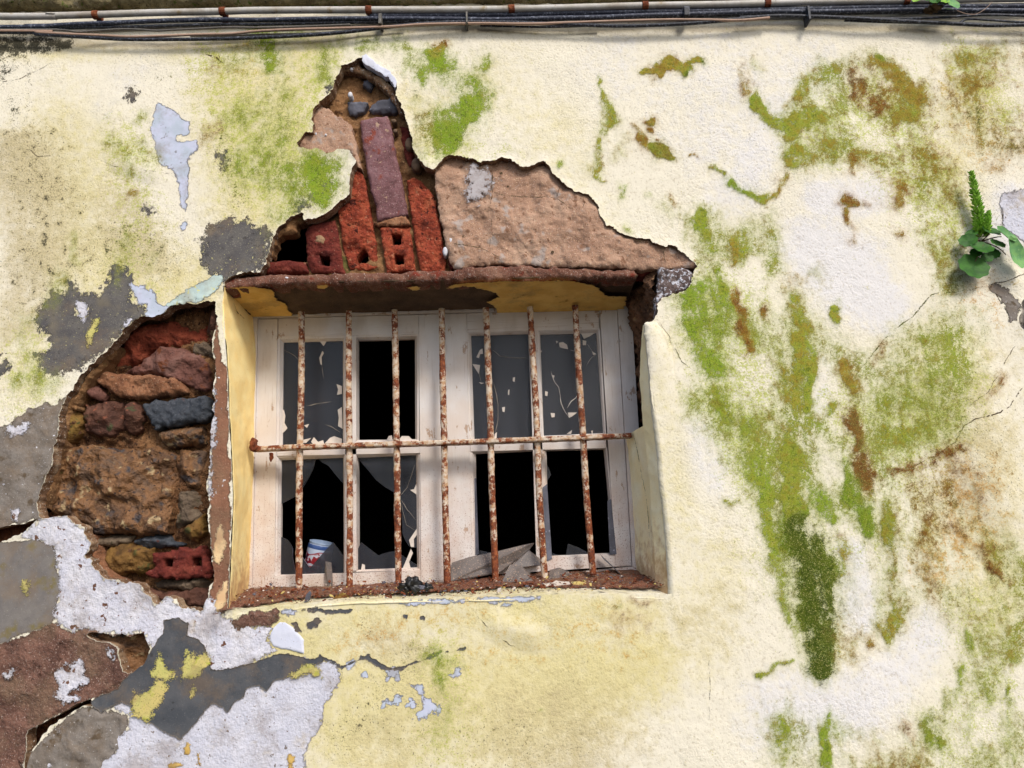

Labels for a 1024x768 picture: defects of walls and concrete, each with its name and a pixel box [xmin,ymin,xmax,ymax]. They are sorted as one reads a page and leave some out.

water stain [709,164,770,205]
peeling [999,188,1024,241]
water stain [773,272,819,414]
crack [853,274,1024,379]
peeling [989,283,1021,323]
spalling [0,54,696,768]
crack [897,349,1022,473]